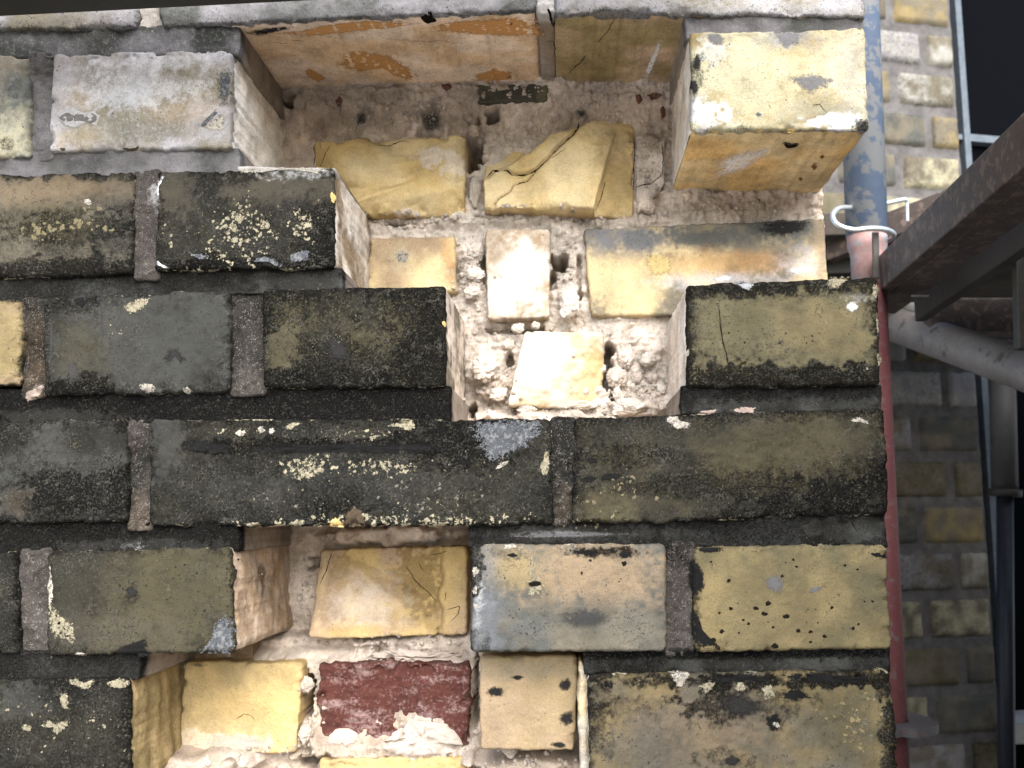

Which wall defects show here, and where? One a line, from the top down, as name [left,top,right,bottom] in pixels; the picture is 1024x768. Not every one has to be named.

crack [488,123,579,207]